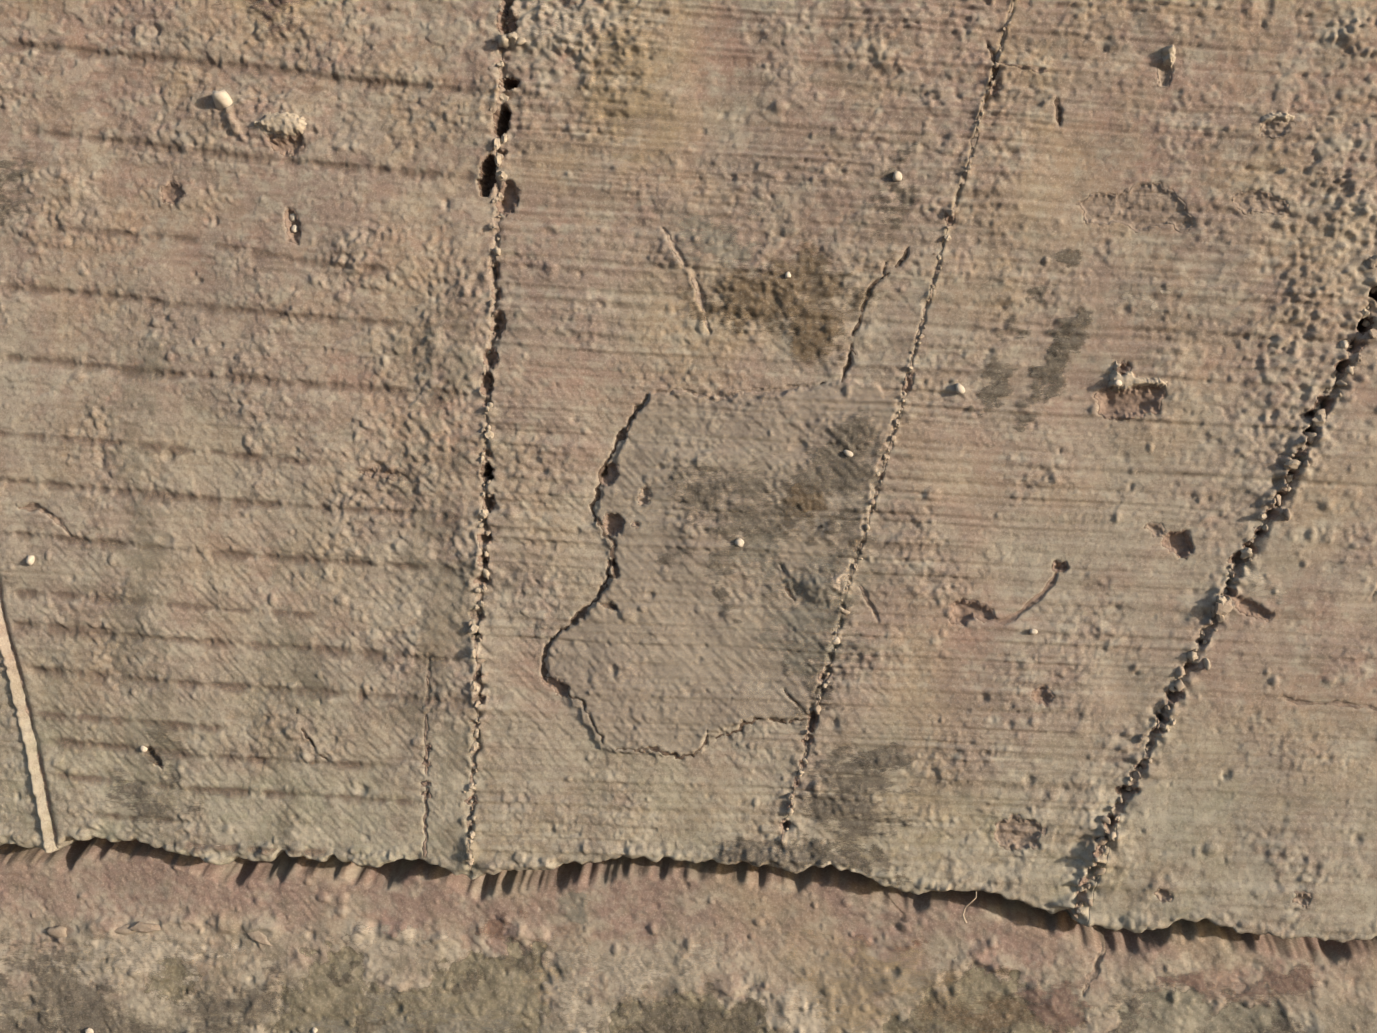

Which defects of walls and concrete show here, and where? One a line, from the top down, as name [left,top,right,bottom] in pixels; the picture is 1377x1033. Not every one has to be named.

crack [541,0,1062,851]